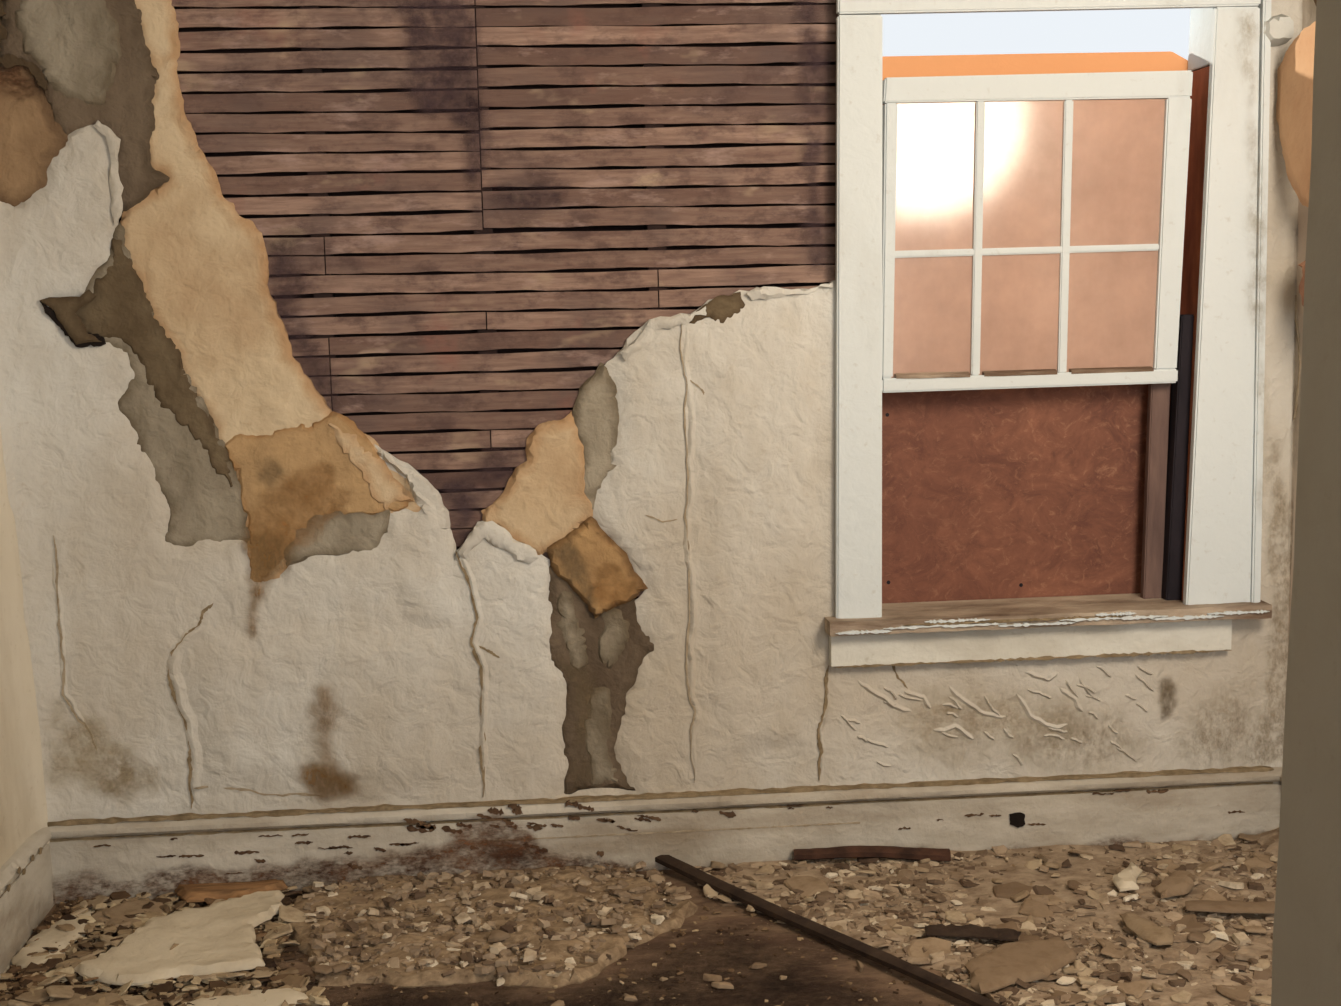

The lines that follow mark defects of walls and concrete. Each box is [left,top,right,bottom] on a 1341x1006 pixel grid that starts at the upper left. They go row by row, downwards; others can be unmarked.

flaking render [1259,14,1316,207]
spalling [0,0,451,582]
flaking render [620,282,833,361]
crack [166,604,325,809]
spalling [234,362,661,870]
crack [456,551,500,797]
crack [646,324,705,783]